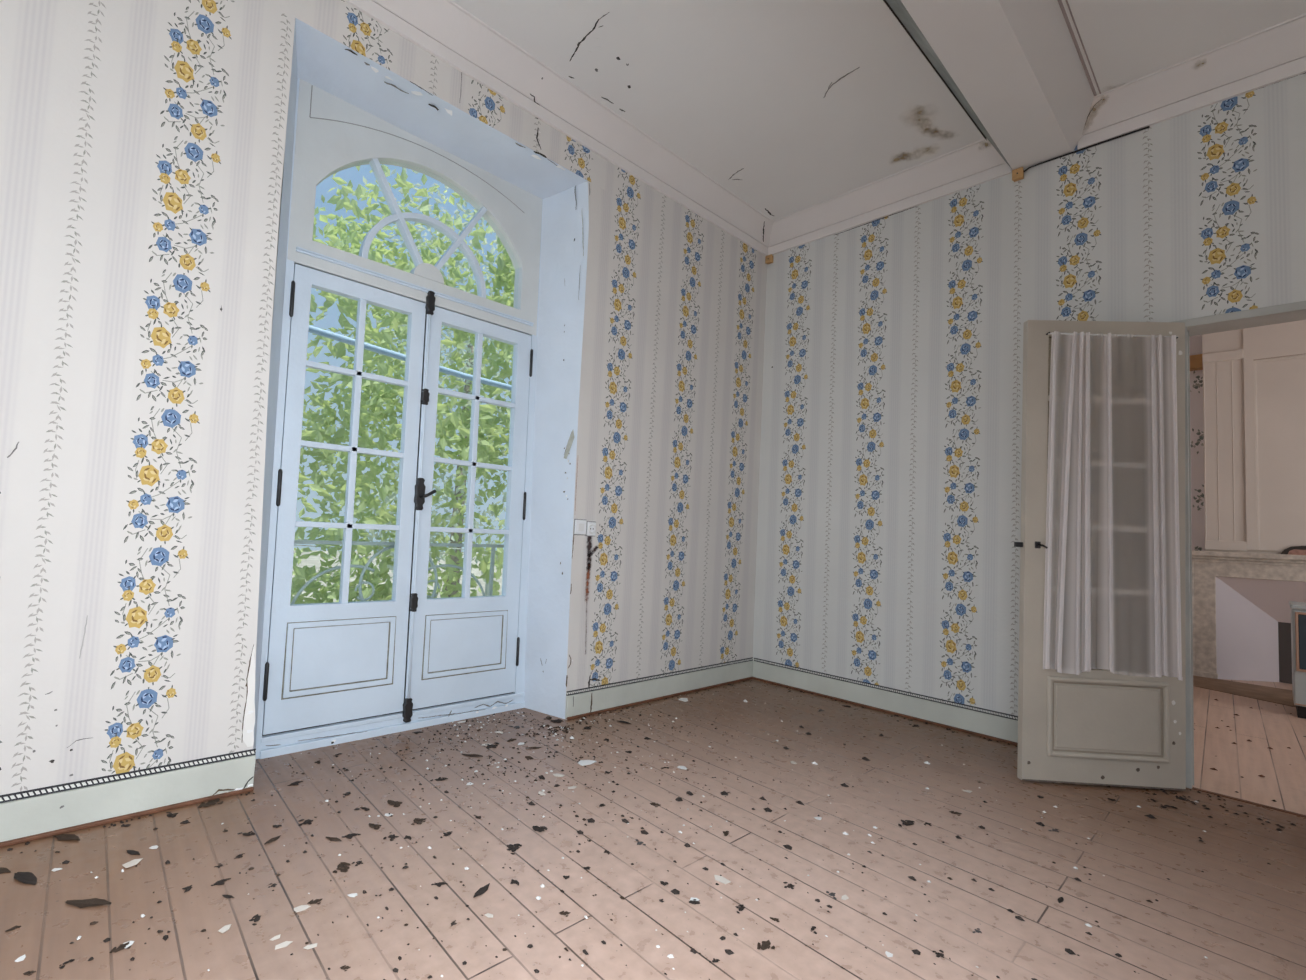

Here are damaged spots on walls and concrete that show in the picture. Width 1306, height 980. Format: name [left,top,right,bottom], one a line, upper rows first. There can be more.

crack [570,12,609,61]